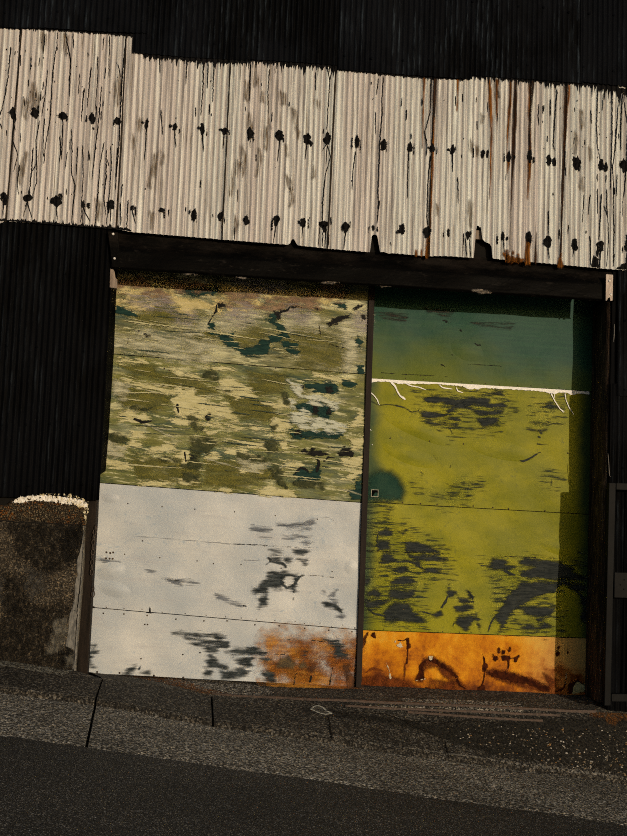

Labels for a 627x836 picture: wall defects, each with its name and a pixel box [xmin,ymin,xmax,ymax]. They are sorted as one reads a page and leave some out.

leakage [5,29,40,220]
leakage [115,36,127,227]
leakage [221,64,246,240]
leakage [327,73,336,249]
rust [489,79,537,265]
rust [558,85,570,268]
peeling [106,272,368,500]
peeling [172,632,306,685]
peeling [252,536,308,608]
rust [263,632,466,690]
peeling [364,522,588,640]
rust [478,647,556,692]